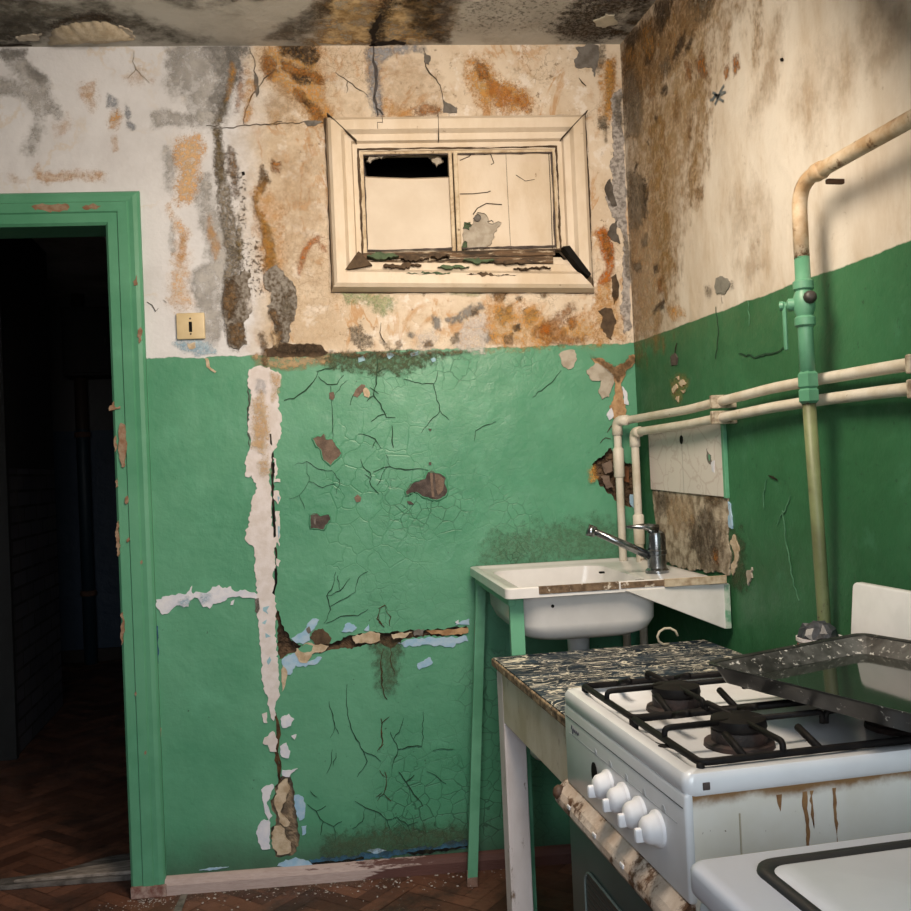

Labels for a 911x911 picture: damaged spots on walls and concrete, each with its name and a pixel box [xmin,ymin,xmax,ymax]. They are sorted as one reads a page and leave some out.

crack [335,15,457,143]
water stain [549,0,673,50]
water stain [0,0,297,350]
peeling [367,212,551,277]
water stain [626,164,648,247]
water stain [705,276,732,303]
crack [247,388,340,595]
peeling [156,333,470,758]
crack [284,358,426,494]
peeling [586,354,635,508]
crack [274,712,282,784]
spalling [256,768,468,867]